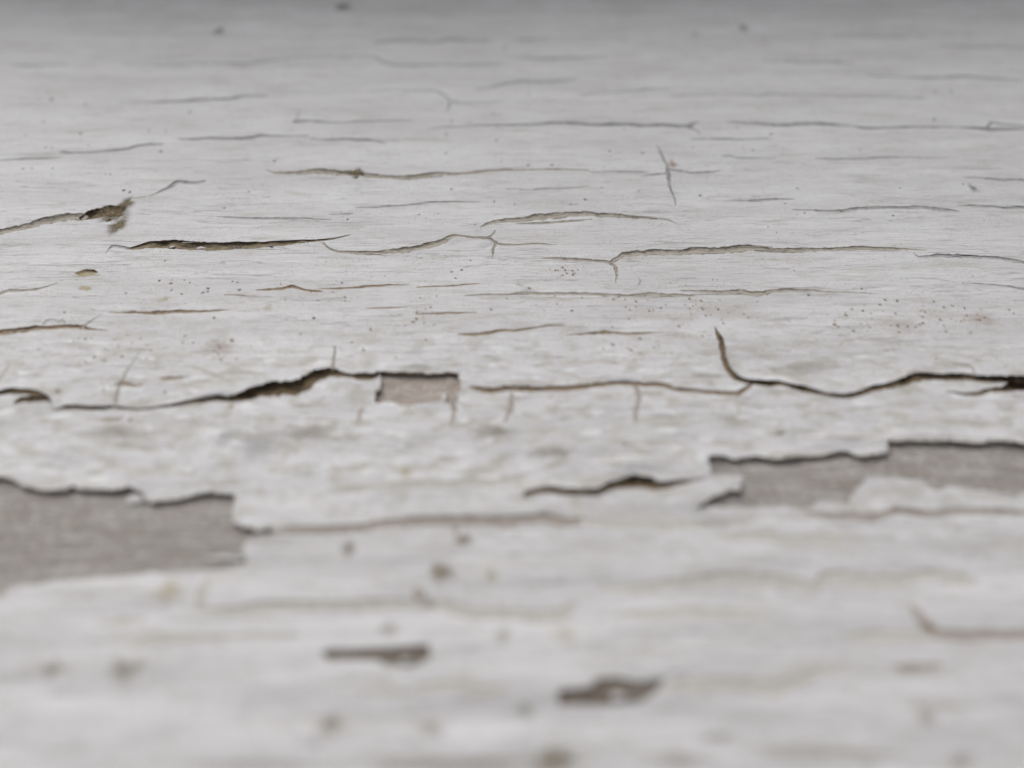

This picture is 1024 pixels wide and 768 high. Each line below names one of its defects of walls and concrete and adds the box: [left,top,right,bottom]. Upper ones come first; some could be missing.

crack [0,37,1024,336]
crack [0,348,379,421]
peeling [374,371,461,405]
crack [449,327,1024,426]
peeling [698,440,1024,509]
peeling [0,476,273,596]